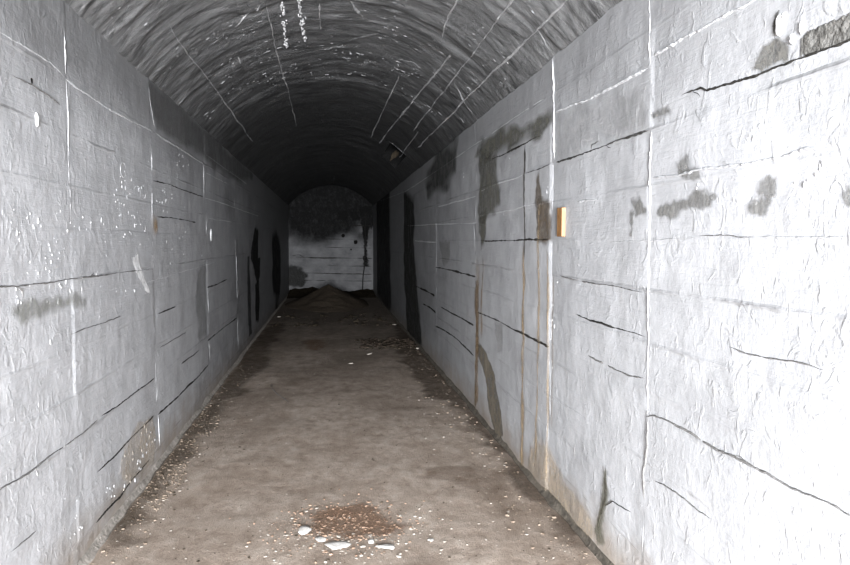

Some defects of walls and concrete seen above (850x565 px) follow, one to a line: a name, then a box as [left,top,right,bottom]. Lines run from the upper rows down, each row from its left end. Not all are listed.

crack [681,38,850,96]
spalling [754,10,850,71]
leakage [477,115,551,244]
leakage [658,191,716,219]
leakage [749,176,776,215]
crack [0,379,153,490]
corrosion [475,276,483,402]
leakage [470,345,508,453]
corrosion [535,251,549,454]
crack [576,314,642,336]
crack [642,415,850,518]
crack [731,345,825,371]